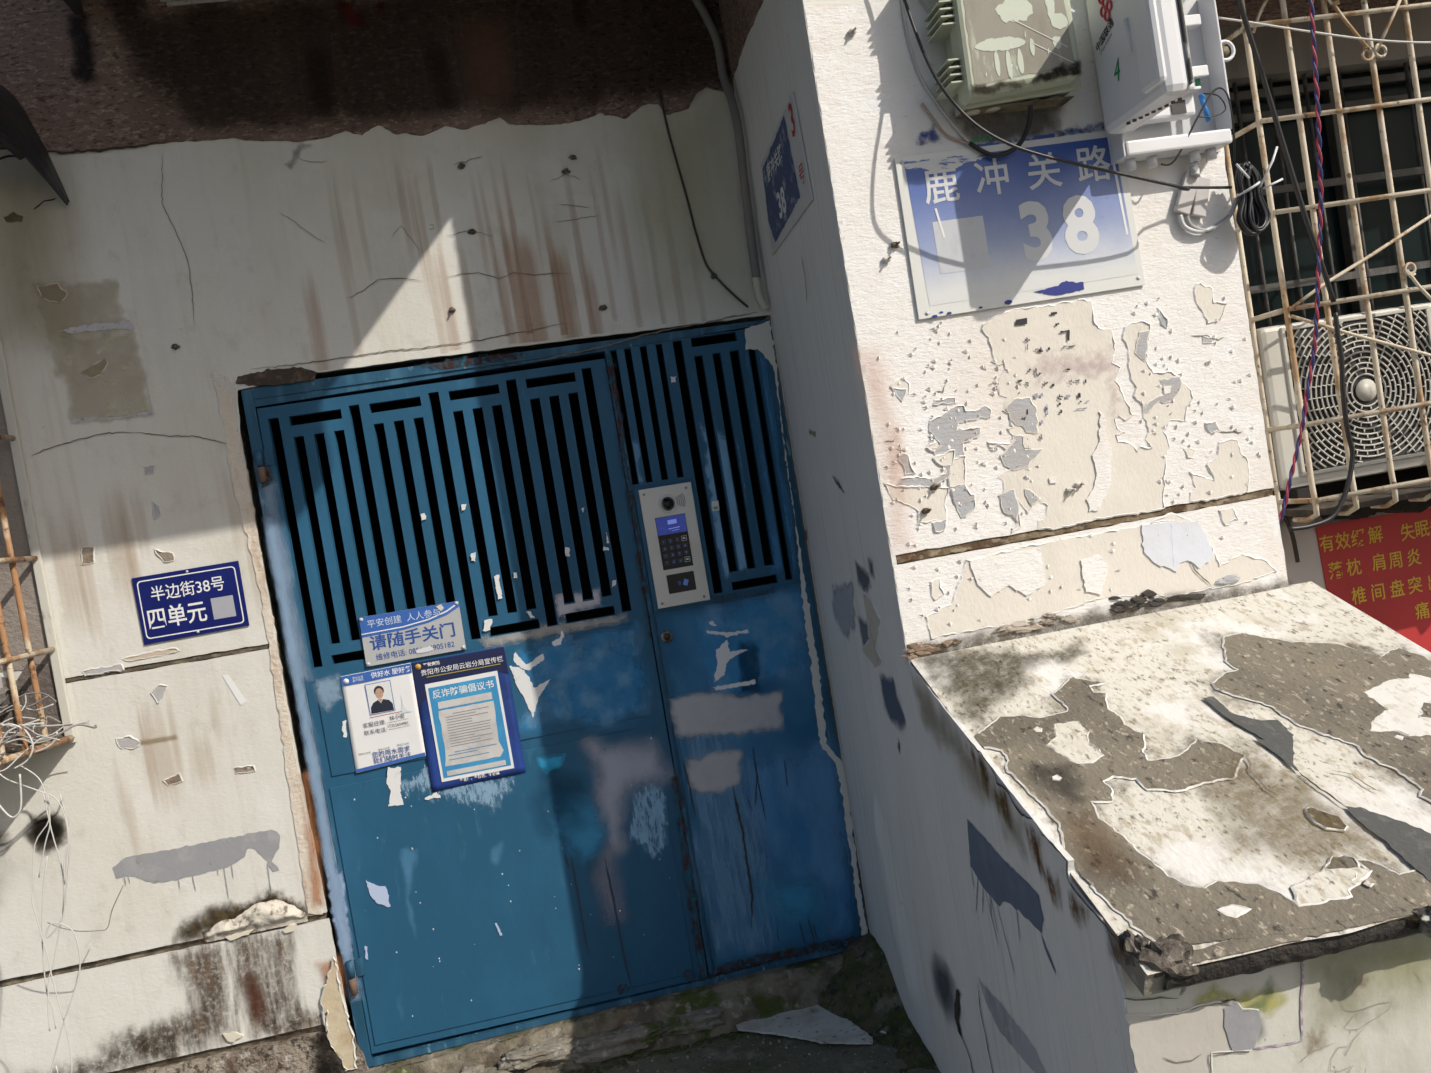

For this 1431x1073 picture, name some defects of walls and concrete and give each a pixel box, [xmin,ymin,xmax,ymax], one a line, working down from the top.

crack [0,142,195,322]
peeling [1193,282,1247,365]
peeling [883,297,1277,660]
peeling [861,590,883,669]
peeling [1211,633,1431,802]
peeling [974,676,1431,979]
leakage [76,894,343,1073]
spalling [320,863,357,1072]
crack [1123,997,1246,1019]
crack [1163,1049,1250,1073]